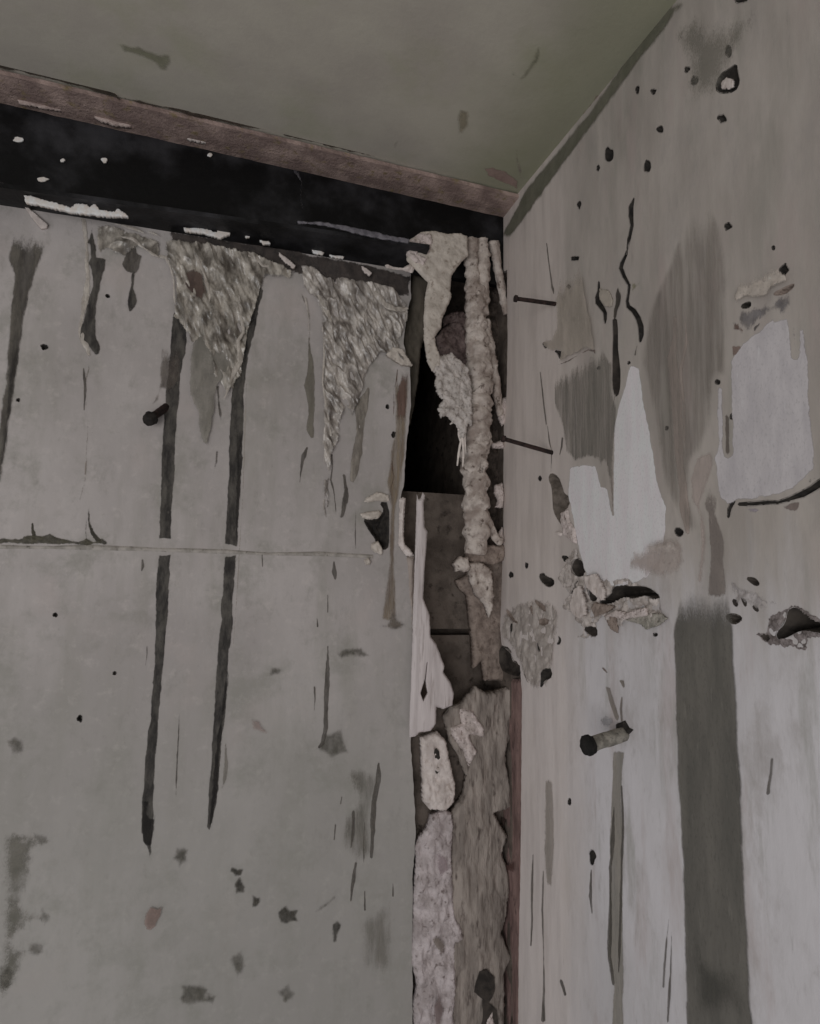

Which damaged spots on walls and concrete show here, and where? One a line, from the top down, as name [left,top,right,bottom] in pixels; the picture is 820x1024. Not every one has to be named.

water stain [0,242,42,473]
water stain [78,219,105,356]
water stain [159,313,187,539]
peeling [97,223,413,565]
crack [595,198,644,412]
flaking render [715,263,814,504]
water stain [142,555,170,854]
water stain [207,288,263,830]
flaking render [499,361,684,1024]
water stain [674,498,752,1024]
spalling [727,577,820,650]